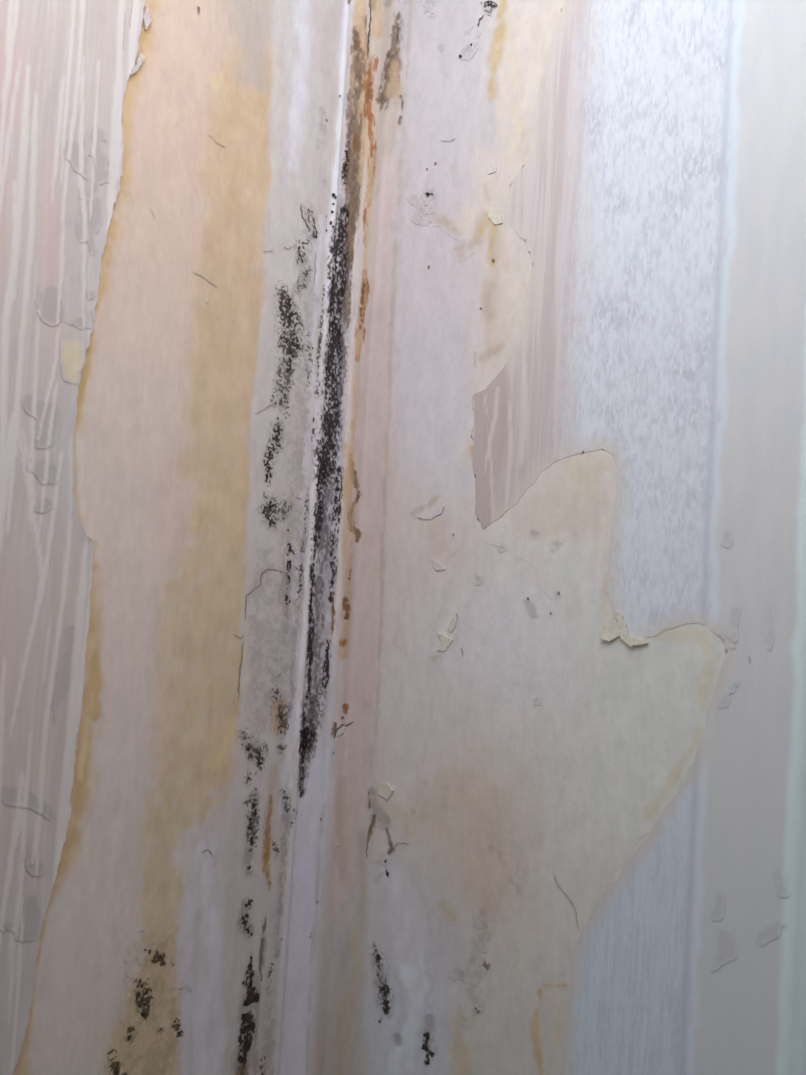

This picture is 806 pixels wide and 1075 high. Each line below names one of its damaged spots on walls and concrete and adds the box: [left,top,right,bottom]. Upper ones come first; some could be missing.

water stain [0,0,167,1075]
water stain [98,0,356,1075]
rust [340,702,350,720]
rust [330,0,408,662]
water stain [312,0,438,1075]